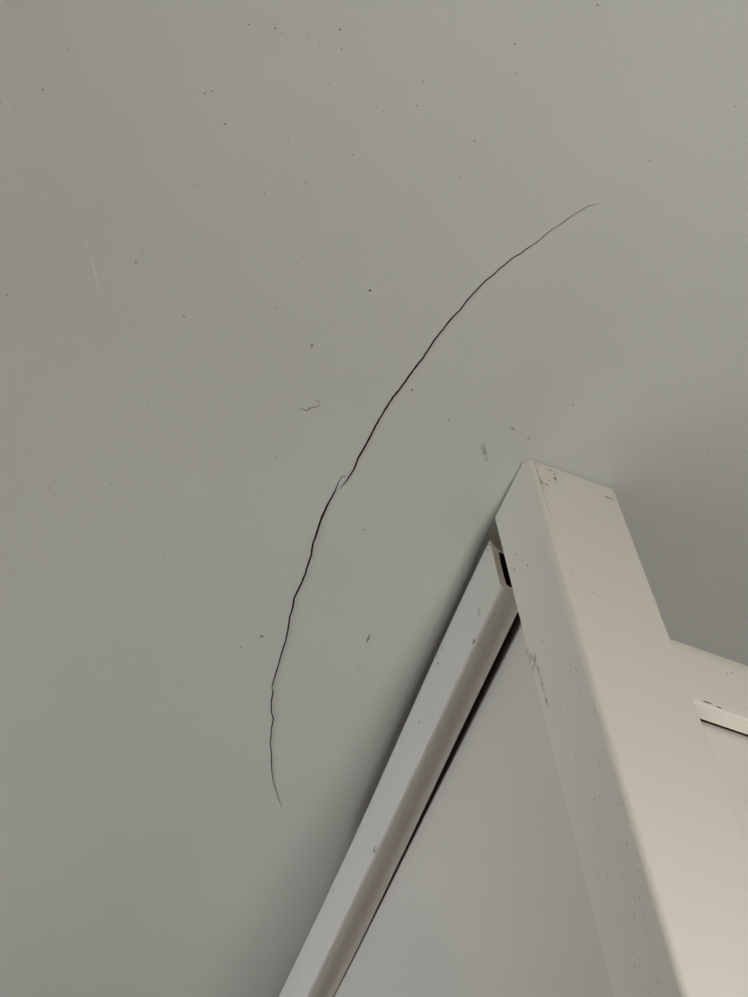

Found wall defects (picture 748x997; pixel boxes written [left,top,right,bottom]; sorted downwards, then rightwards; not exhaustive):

crack [270,203,599,804]